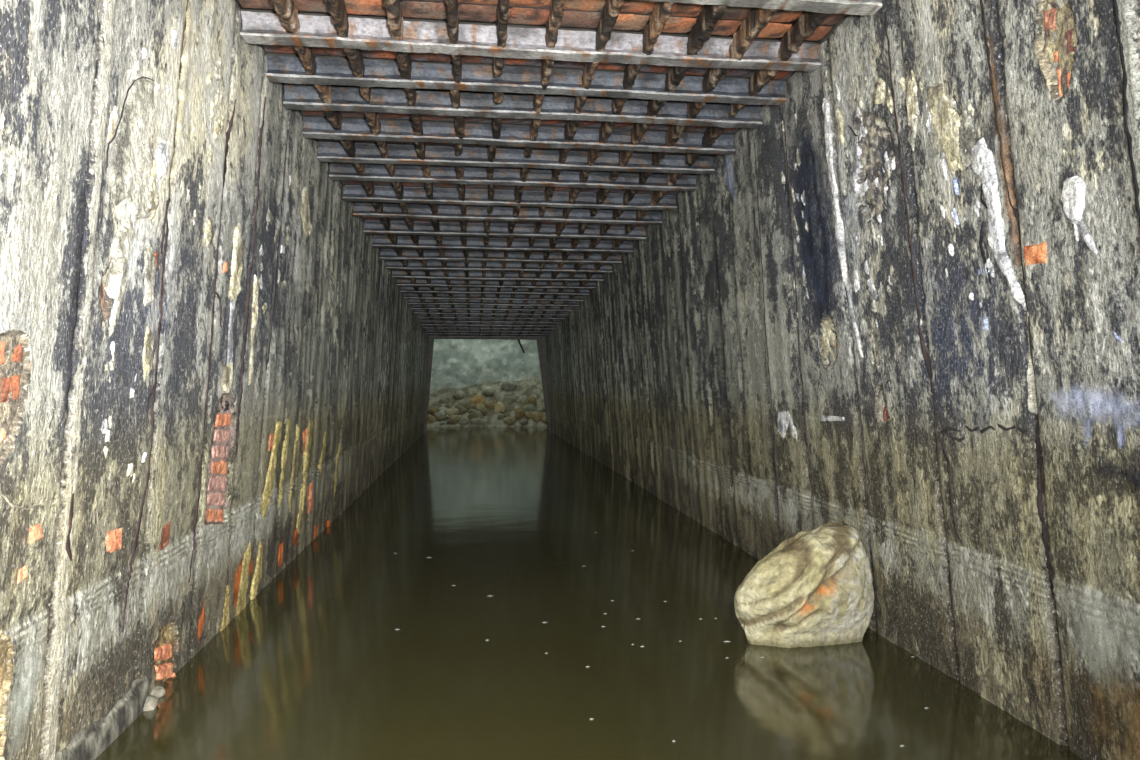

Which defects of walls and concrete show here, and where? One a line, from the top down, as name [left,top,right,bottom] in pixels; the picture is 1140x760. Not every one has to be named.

spalling [1034,0,1078,103]
spalling [0,329,32,466]
spalling [205,175,313,525]
crack [821,0,1062,662]
damp [971,137,1038,414]
damp [1060,392,1132,445]
spalling [0,623,15,760]
spalling [153,620,180,686]